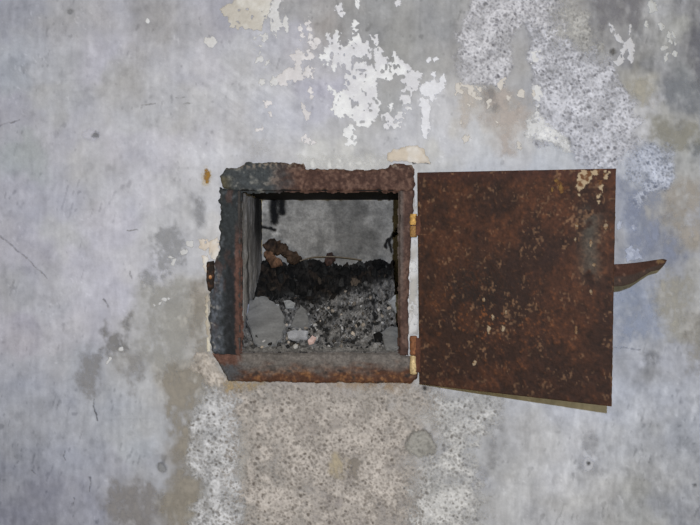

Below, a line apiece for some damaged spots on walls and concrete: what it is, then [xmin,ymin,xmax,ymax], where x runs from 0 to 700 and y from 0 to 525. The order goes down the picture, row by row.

peeling [220,0,446,146]
flaking render [387,145,430,164]